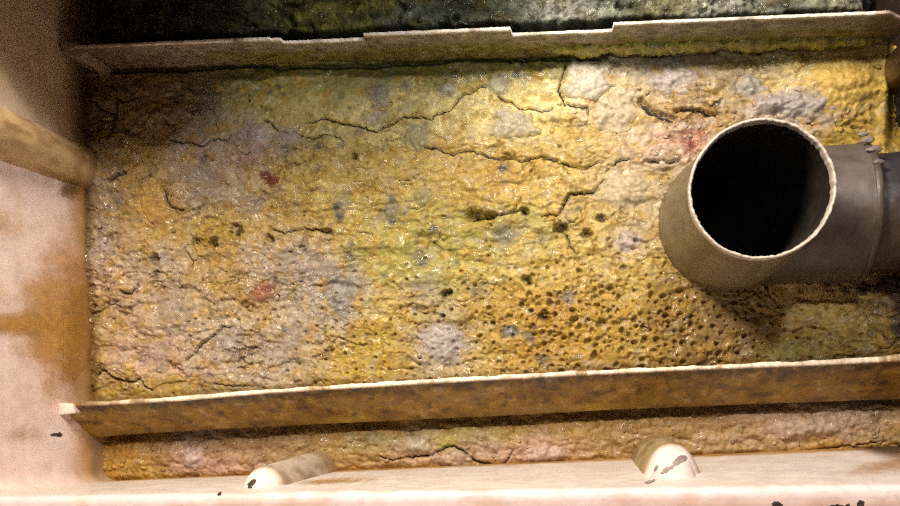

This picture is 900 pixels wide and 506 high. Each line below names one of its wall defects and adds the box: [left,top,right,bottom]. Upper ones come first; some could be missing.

crack [305,65,589,141]
crack [640,104,717,123]
crack [424,147,679,254]
crack [270,227,324,235]
crack [189,326,236,359]
crack [99,370,152,390]